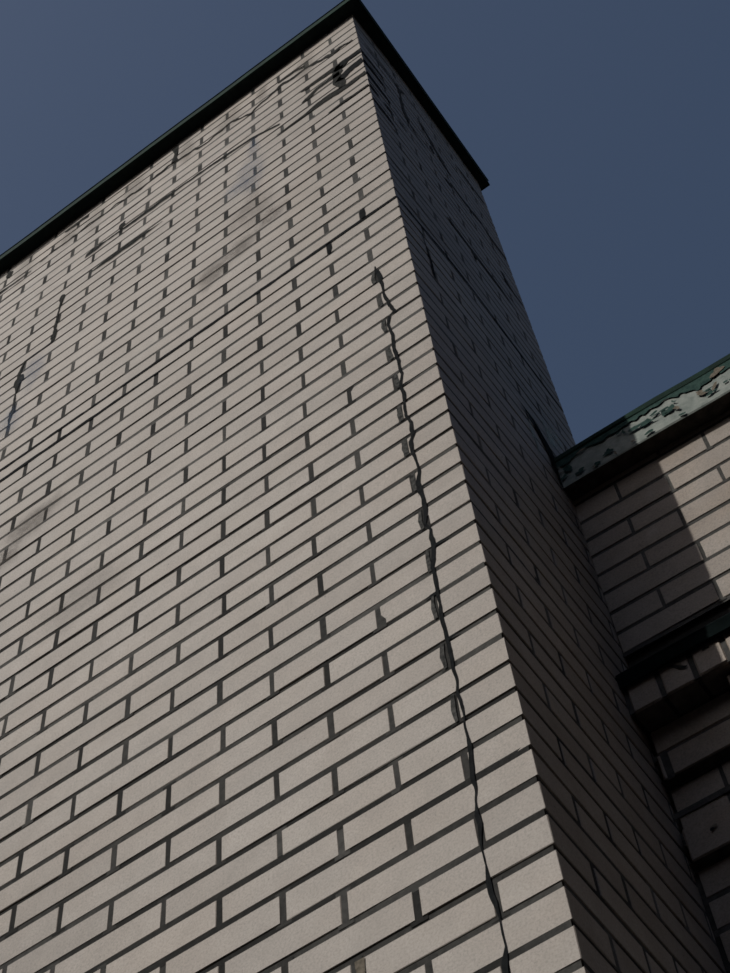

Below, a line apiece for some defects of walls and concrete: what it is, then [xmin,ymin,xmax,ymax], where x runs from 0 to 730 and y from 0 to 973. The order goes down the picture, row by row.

crack [40,39,426,262]
crack [7,294,65,428]
peeling [555,360,730,480]
crack [371,266,508,973]